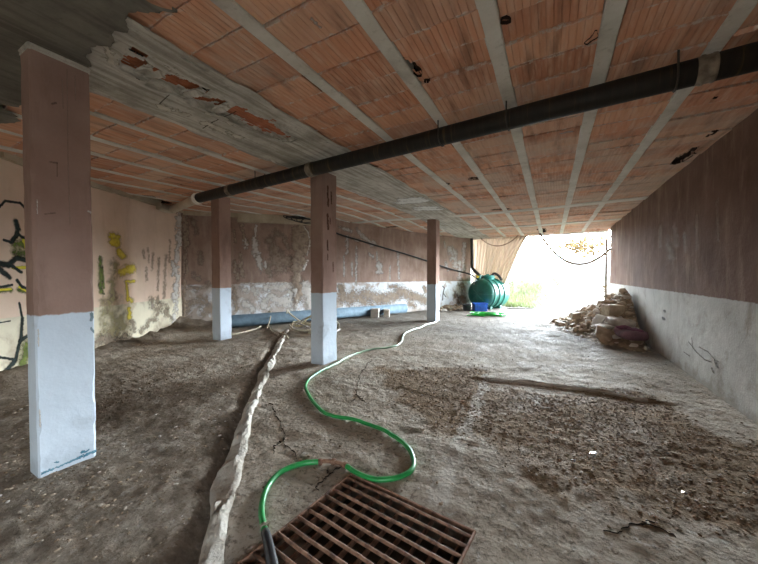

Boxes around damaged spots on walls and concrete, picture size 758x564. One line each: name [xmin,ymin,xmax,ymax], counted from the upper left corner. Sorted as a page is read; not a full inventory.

spalling [117,47,296,142]
leakage [99,262,127,339]
peeling [231,224,294,314]
peeling [336,283,427,308]
crack [269,403,297,459]
crack [603,520,676,537]